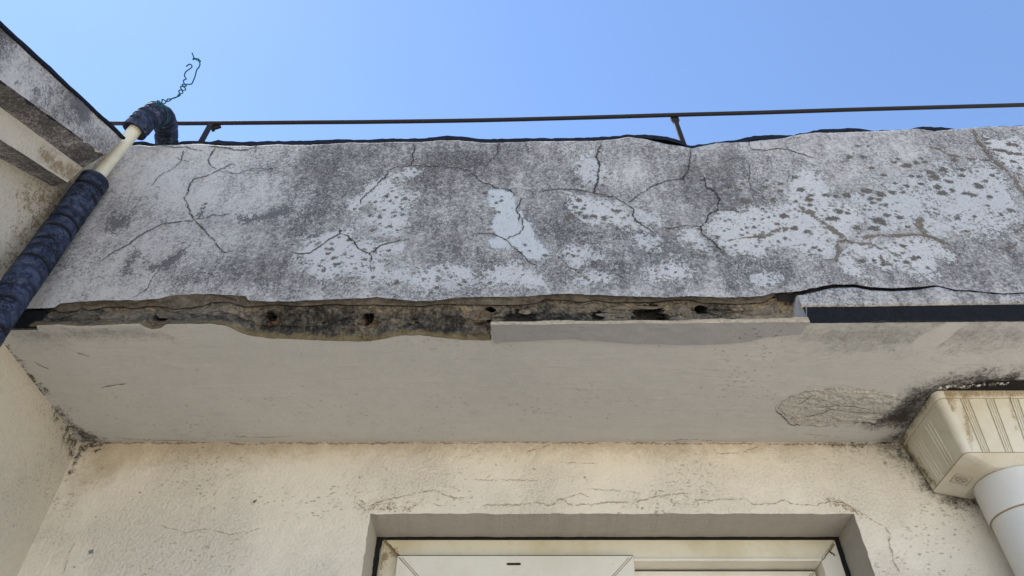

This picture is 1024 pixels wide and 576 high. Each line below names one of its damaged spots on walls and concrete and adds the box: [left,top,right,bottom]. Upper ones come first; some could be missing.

crack [104,144,272,298]
crack [296,228,405,272]
spalling [28,131,1024,345]
crack [360,141,1024,302]
crack [931,130,1024,193]
water stain [6,346,109,465]
water stain [852,369,1023,490]